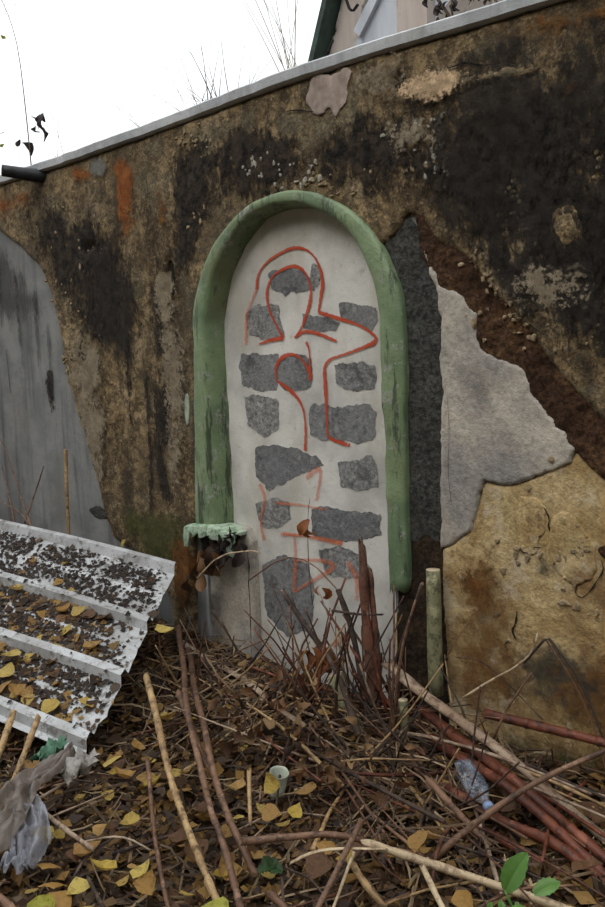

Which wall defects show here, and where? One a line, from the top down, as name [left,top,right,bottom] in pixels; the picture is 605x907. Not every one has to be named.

flaking render [306,67,352,116]
corrosion [113,159,134,234]
water stain [25,16,605,620]
flaking render [385,212,605,725]
crack [575,560,604,598]